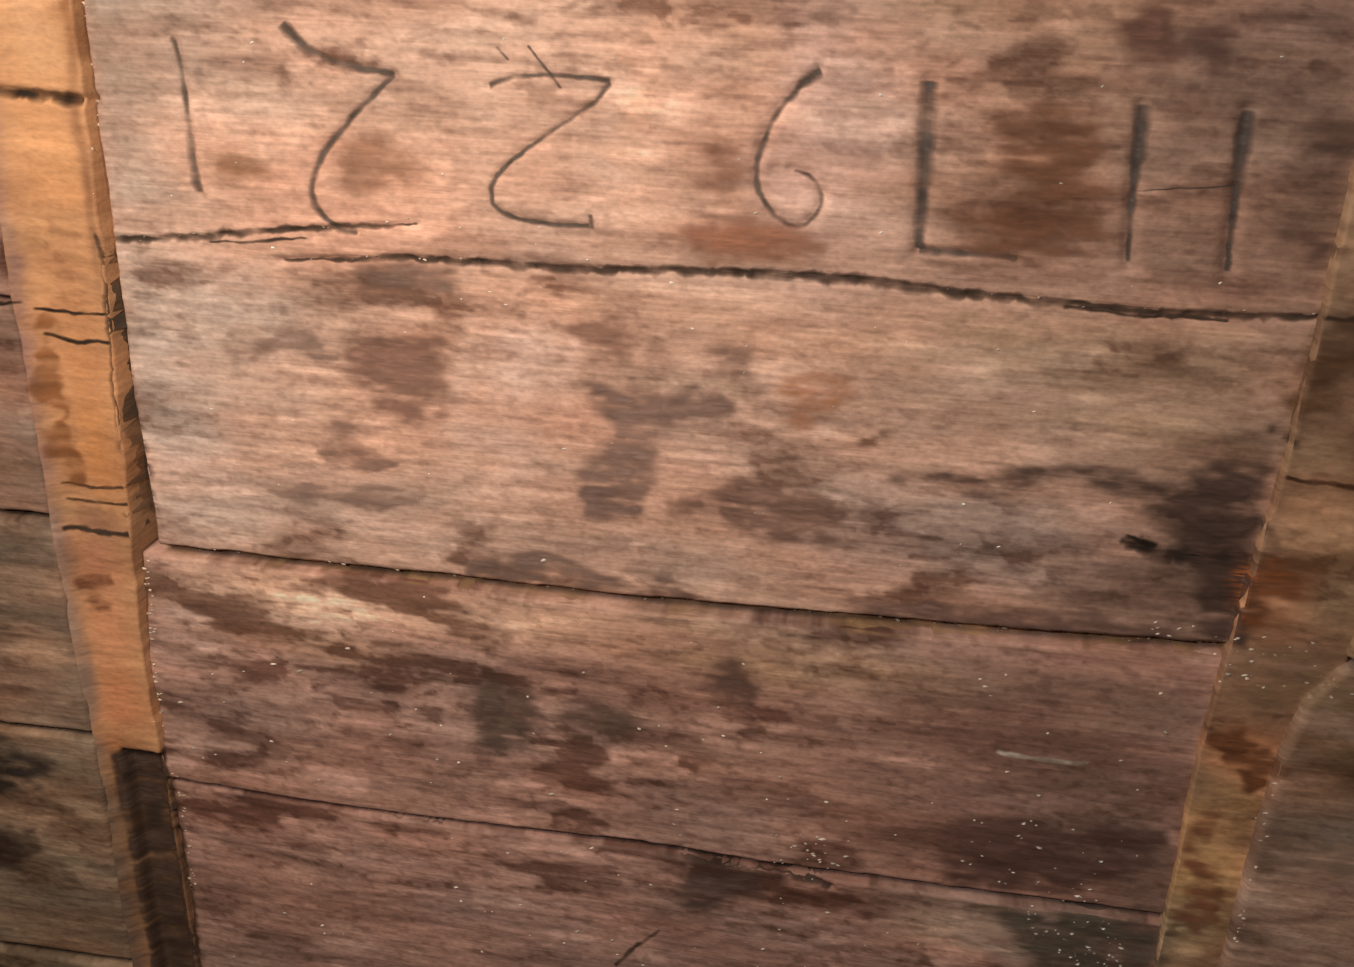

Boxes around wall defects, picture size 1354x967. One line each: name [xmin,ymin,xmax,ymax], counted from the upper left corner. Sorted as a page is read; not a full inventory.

leakage [976,110,1107,255]
crack [0,218,1354,537]
leakage [578,384,733,519]
leakage [678,480,843,541]
leakage [466,552,624,589]
leakage [868,465,1270,644]
crack [1121,535,1233,562]
leakage [0,753,50,792]
leakage [1207,731,1280,793]
leakage [947,821,1166,893]
leakage [1175,822,1221,930]
leakage [998,905,1160,967]